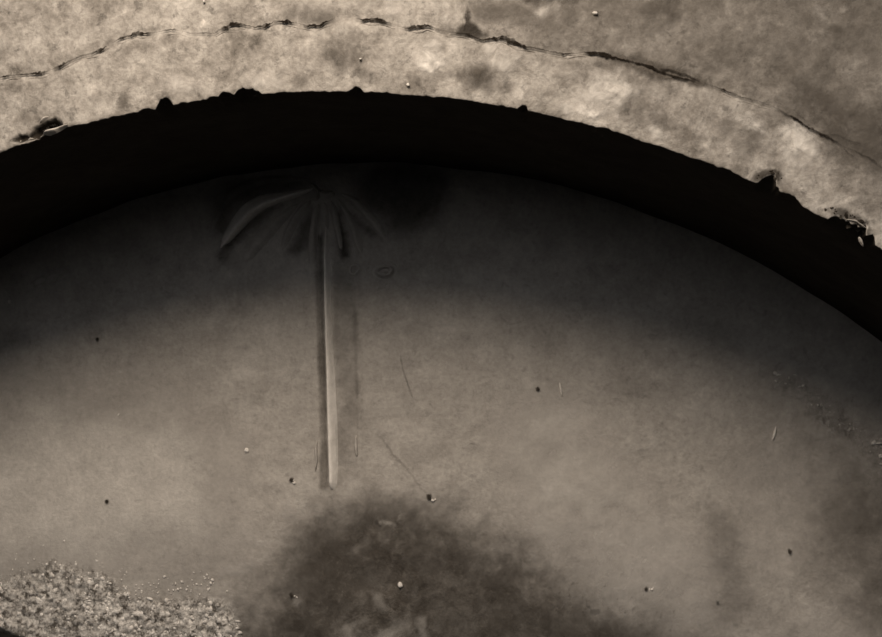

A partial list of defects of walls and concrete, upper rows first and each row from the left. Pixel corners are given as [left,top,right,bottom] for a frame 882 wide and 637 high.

crack [0,19,333,82]
crack [360,17,696,82]
flaking render [13,116,68,142]
crack [718,88,836,142]
flaking render [824,207,866,246]